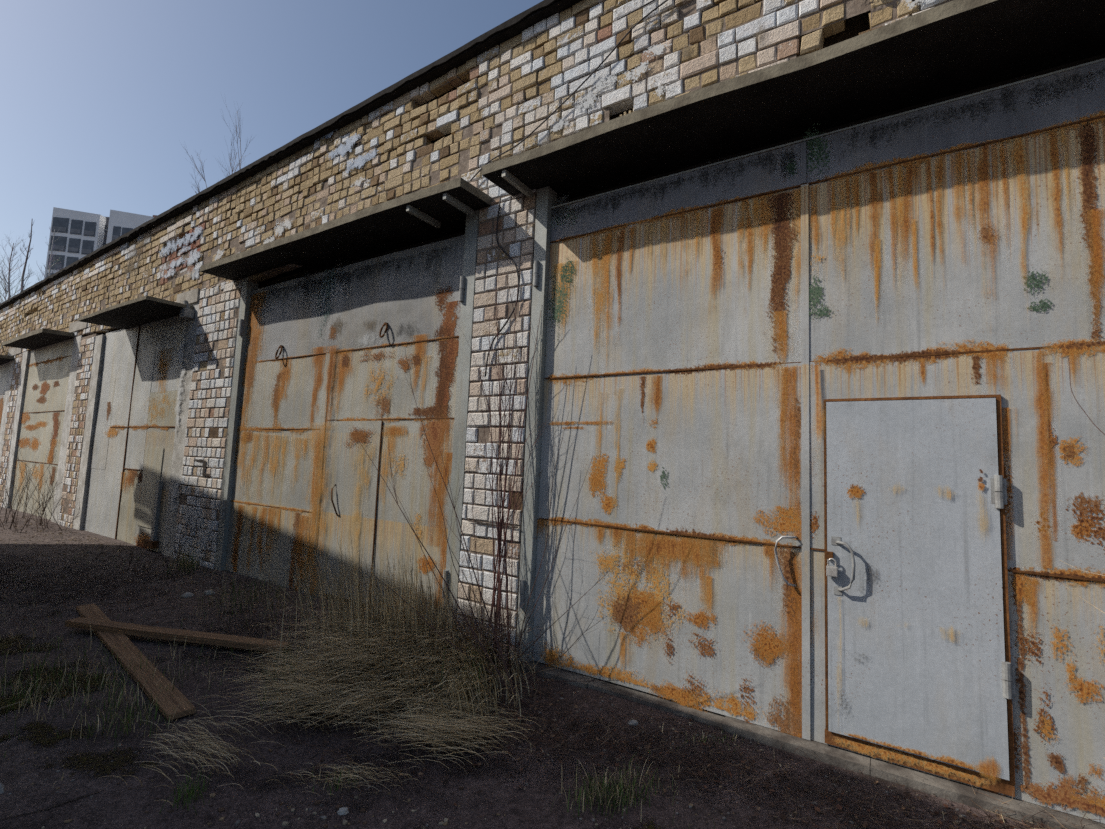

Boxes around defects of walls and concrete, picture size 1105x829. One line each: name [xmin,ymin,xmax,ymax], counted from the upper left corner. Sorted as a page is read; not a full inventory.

rust [231,282,460,609]
rust [537,111,1105,817]